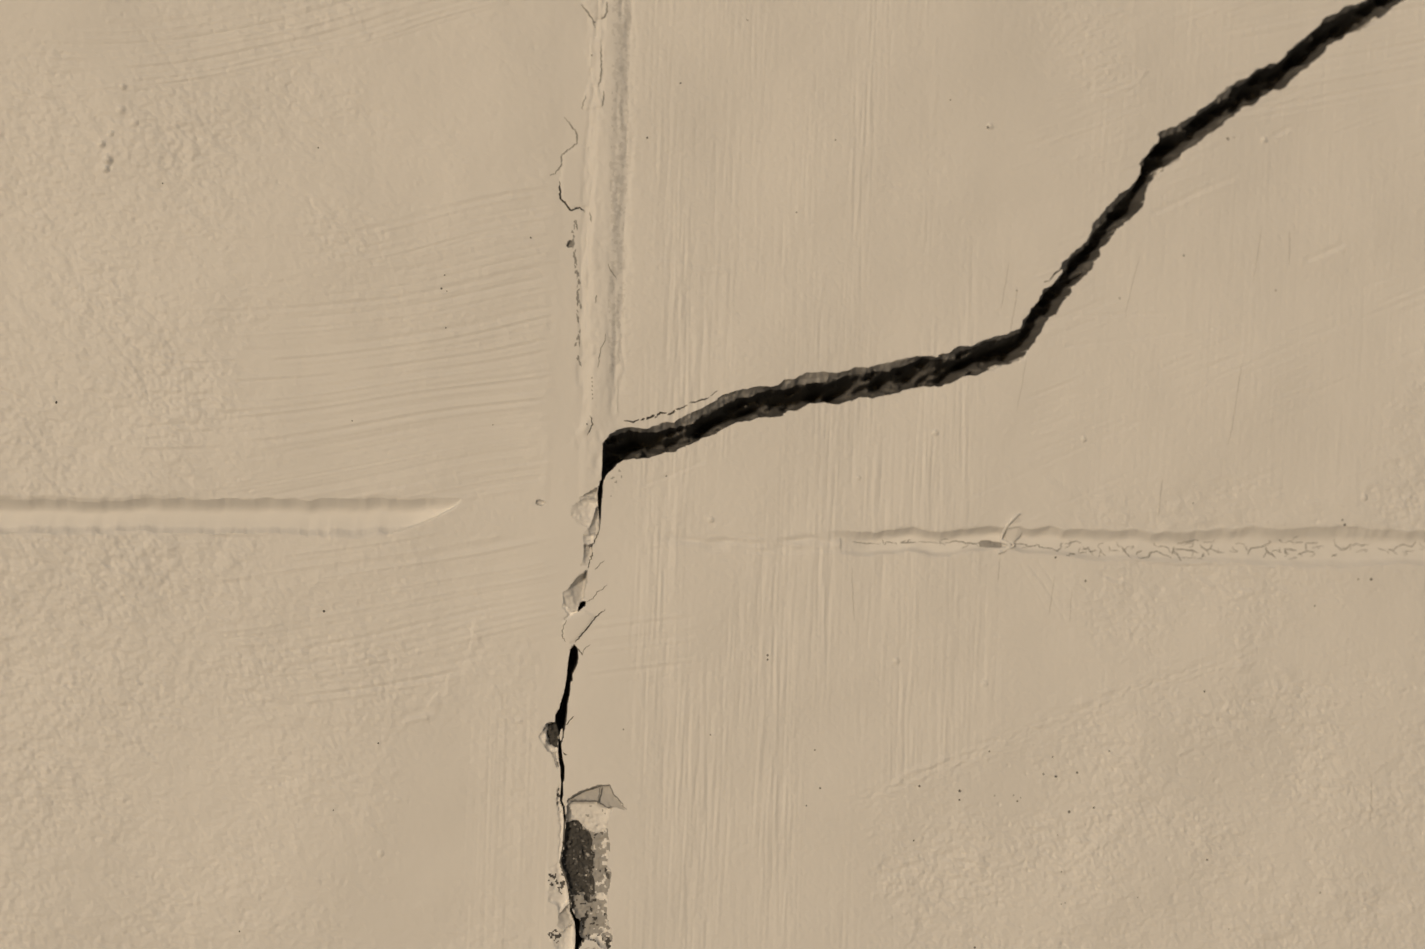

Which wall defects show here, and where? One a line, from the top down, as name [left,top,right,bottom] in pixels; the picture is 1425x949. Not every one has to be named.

peeling [561,487,599,643]
crack [551,0,1424,949]
spalling [538,722,625,949]